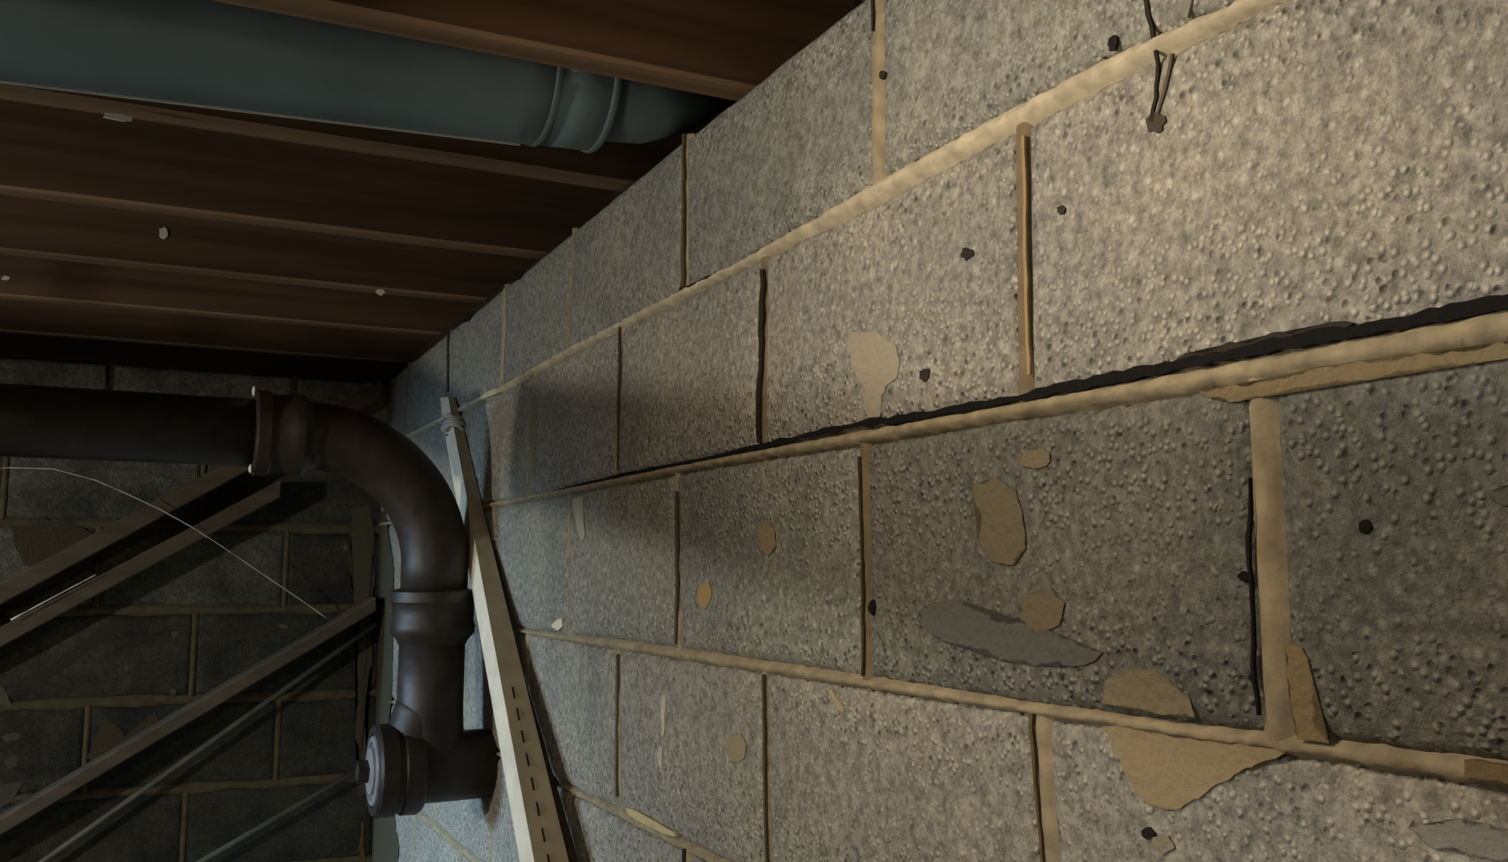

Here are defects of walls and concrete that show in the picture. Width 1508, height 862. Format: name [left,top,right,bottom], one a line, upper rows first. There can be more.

crack [1143,0,1175,122]
crack [528,269,1508,676]
crack [1245,477,1261,715]